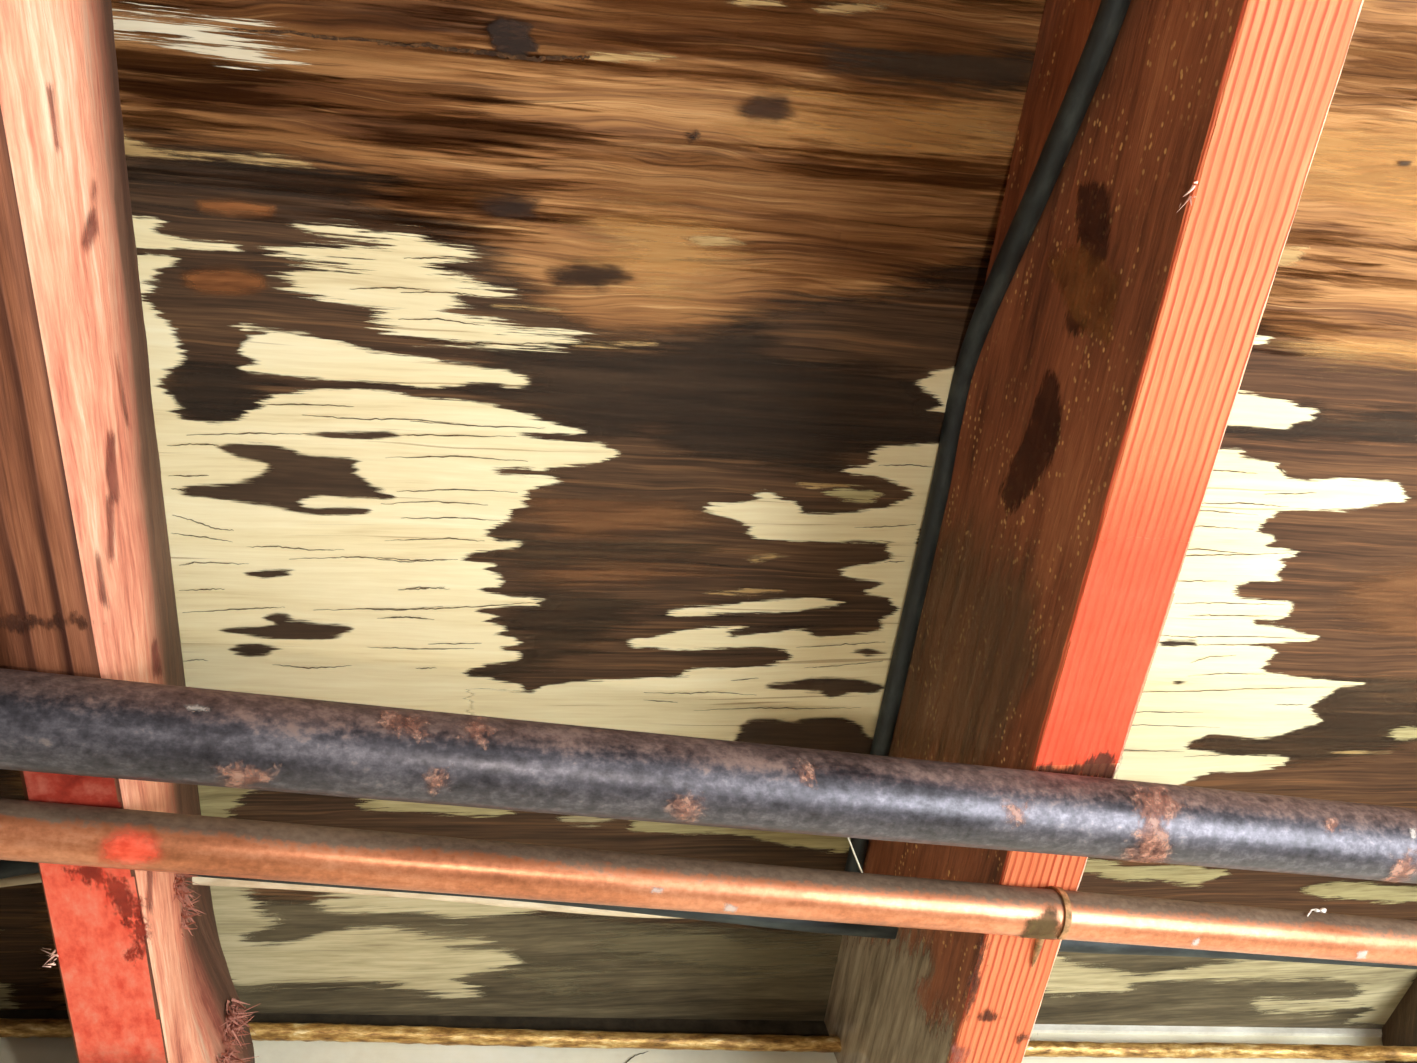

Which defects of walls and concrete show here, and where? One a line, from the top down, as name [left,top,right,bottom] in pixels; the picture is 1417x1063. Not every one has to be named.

leakage [830,40,1035,92]
peeling [198,201,273,215]
peeling [1253,335,1274,345]
peeling [915,368,955,413]
peeling [1227,390,1318,429]
peeling [132,216,939,741]
peeling [1113,449,1417,785]
peeling [626,820,851,854]
peeling [1298,880,1417,904]
peeling [210,886,838,1001]